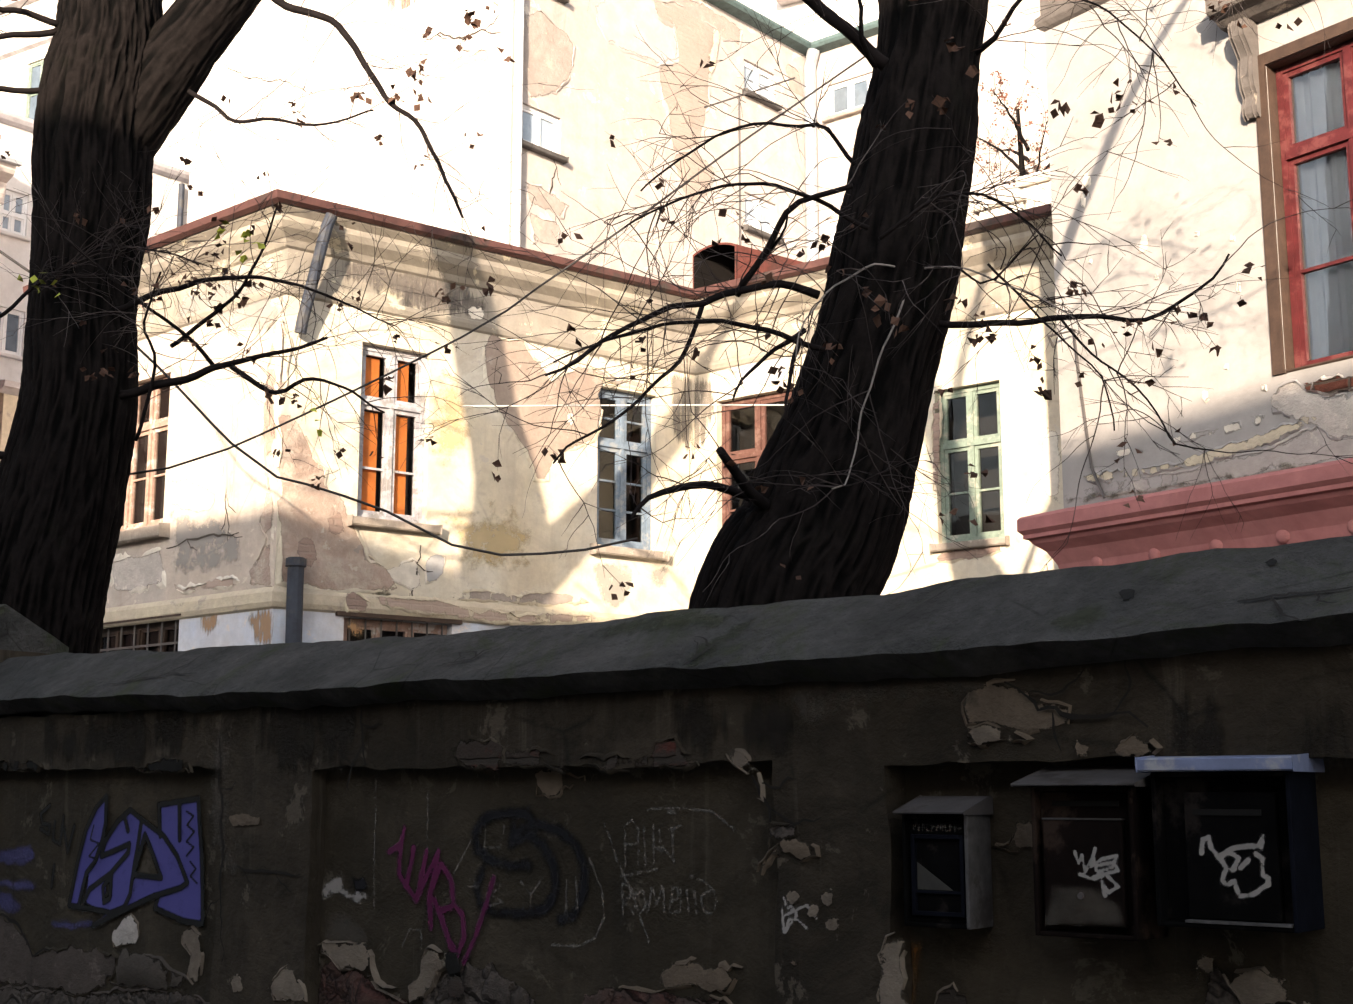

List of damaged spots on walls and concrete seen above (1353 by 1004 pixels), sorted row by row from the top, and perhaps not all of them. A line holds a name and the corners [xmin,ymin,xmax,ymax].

spalling [523,8,576,98]
spalling [653,0,743,201]
spalling [521,180,569,247]
peeling [481,335,649,483]
peeling [1083,374,1353,497]
spalling [109,318,592,626]
peeling [961,678,1072,749]
spalling [268,939,536,1004]
peeling [582,956,743,1004]
peeling [876,932,908,1004]
peeling [1196,954,1310,1004]